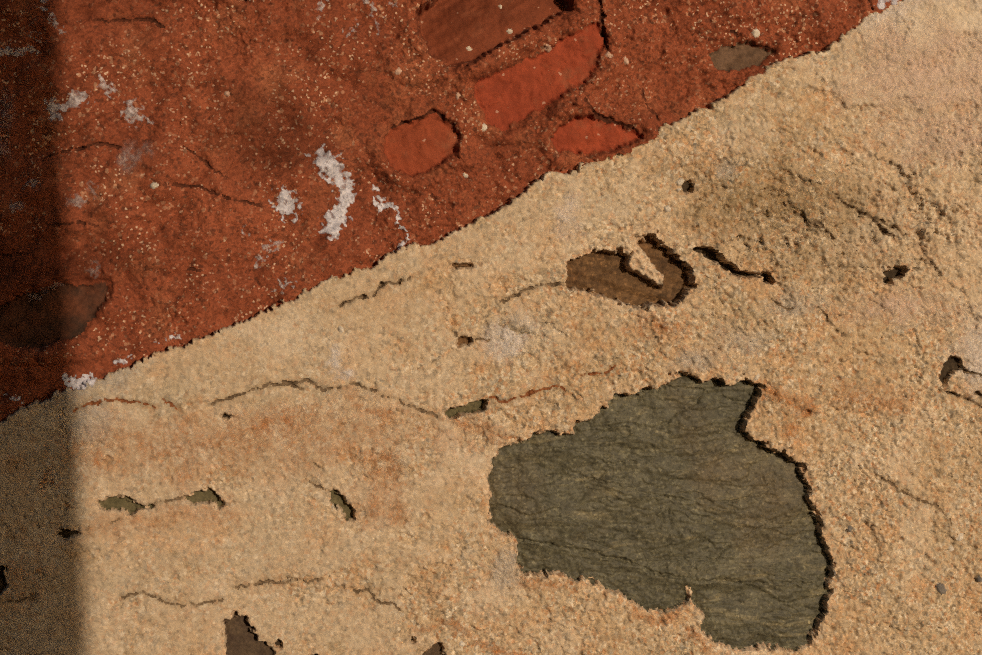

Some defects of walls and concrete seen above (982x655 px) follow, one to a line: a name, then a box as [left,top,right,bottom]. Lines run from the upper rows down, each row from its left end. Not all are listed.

spalling [414,0,575,71]
flaking render [565,229,699,312]
flaking render [692,245,776,285]
flaking render [882,265,910,287]
crack [73,397,177,413]
crack [211,378,438,419]
flaking render [938,355,965,389]
crack [938,367,982,408]
flaking render [95,494,155,517]
flaking render [324,488,356,522]
flaking render [486,370,836,652]
flaking render [219,610,283,655]